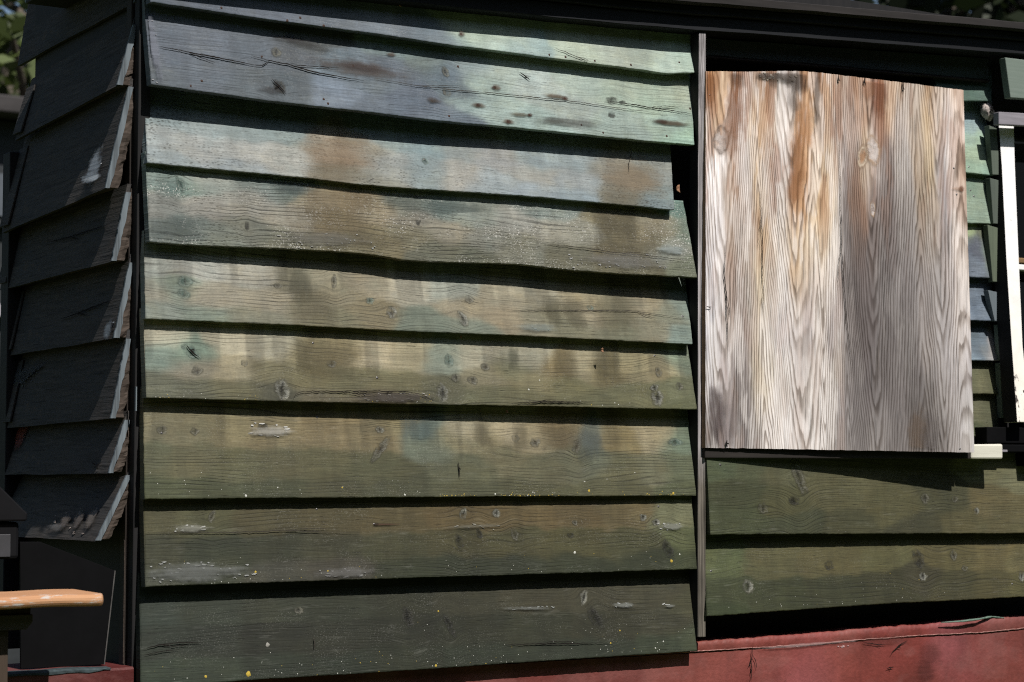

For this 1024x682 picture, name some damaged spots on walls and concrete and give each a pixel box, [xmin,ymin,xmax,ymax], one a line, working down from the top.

crack [159,46,690,114]
peeling [250,422,290,437]
peeling [174,524,206,532]
peeling [150,561,257,583]